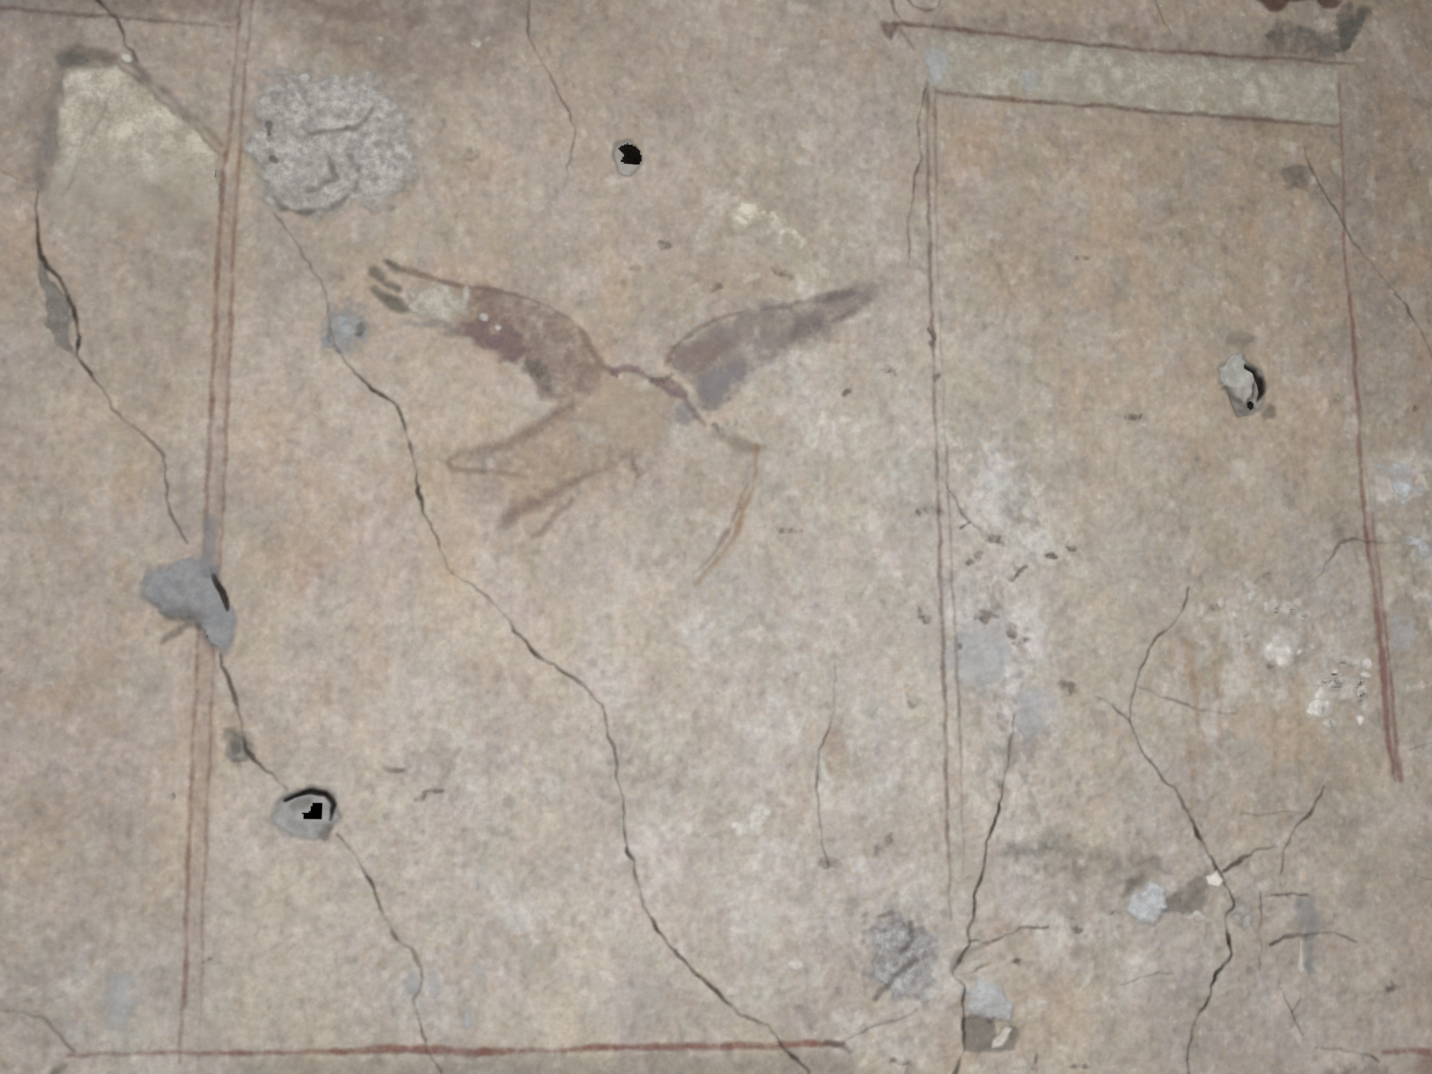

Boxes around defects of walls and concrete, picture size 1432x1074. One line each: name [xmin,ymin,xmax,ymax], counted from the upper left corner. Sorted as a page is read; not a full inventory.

flaking render [52,51,219,201]
flaking render [40,261,72,351]
crack [37,220,92,376]
crack [360,377,411,447]
crack [415,482,423,507]
crack [221,666,236,703]
crack [244,746,260,765]
crack [987,802,1000,840]
crack [653,920,727,1003]
flaking render [864,913,938,1001]
crack [1194,826,1241,1009]
flaking render [963,979,1016,1051]